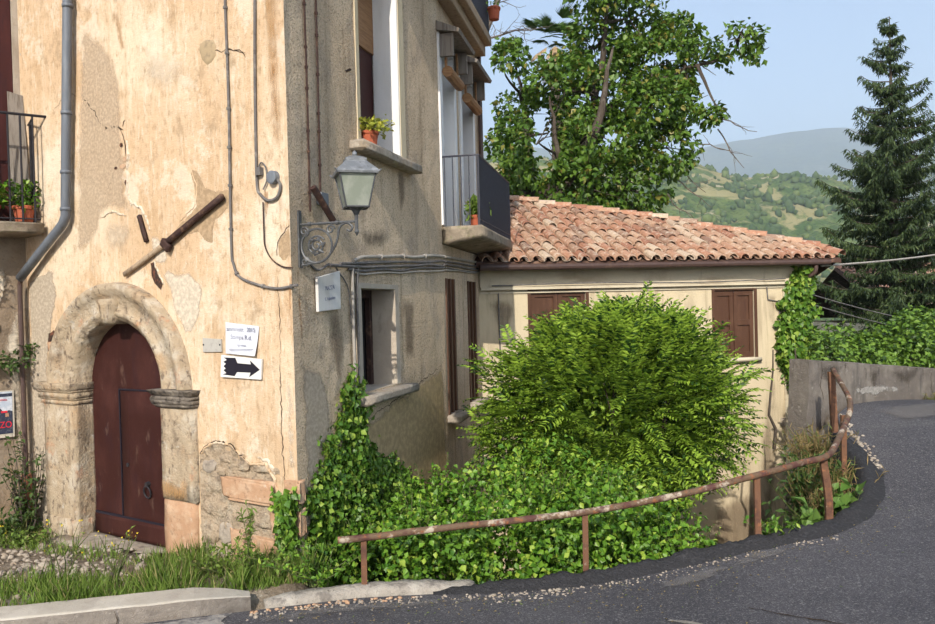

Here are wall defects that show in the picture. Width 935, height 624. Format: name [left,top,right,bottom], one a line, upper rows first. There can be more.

crack [54,94,126,156]
peeling [79,36,229,331]
flaking render [199,368,329,561]